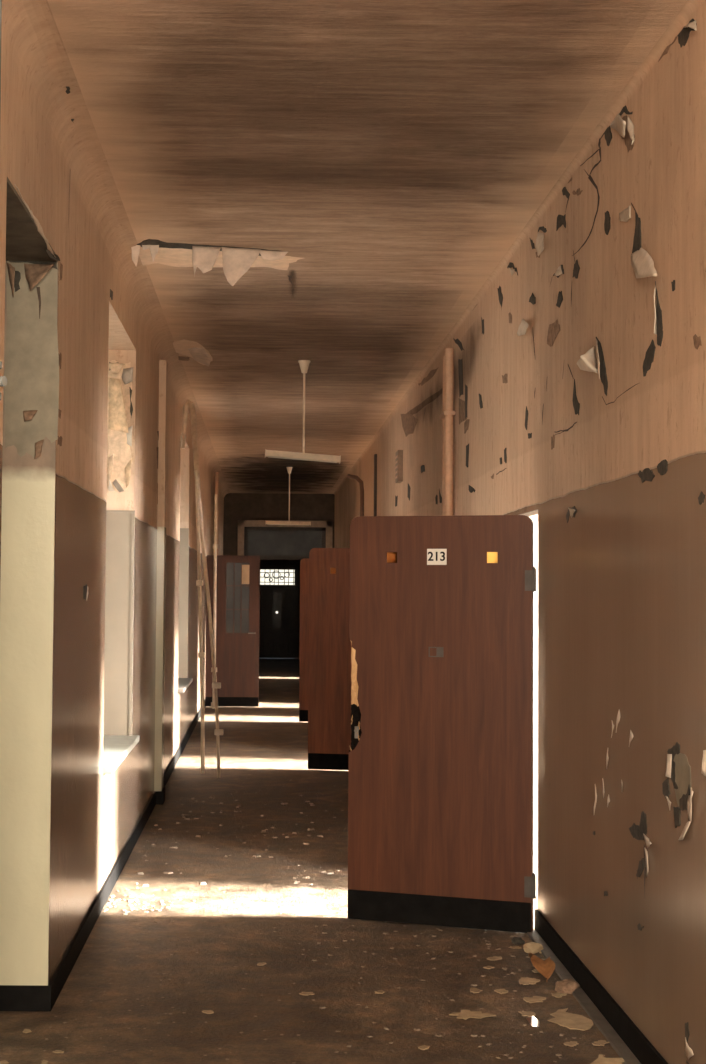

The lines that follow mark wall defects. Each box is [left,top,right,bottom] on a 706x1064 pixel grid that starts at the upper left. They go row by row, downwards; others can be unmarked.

peeling [131,239,303,286]
peeling [497,286,528,336]
peeling [530,178,583,258]
peeling [547,251,580,347]
crack [572,126,610,256]
peeling [604,202,663,377]
peeling [107,360,133,492]
flaking render [401,389,442,437]
flaking render [453,338,483,468]
peeling [562,337,608,415]
peeling [662,742,706,840]
peeling [629,811,652,891]